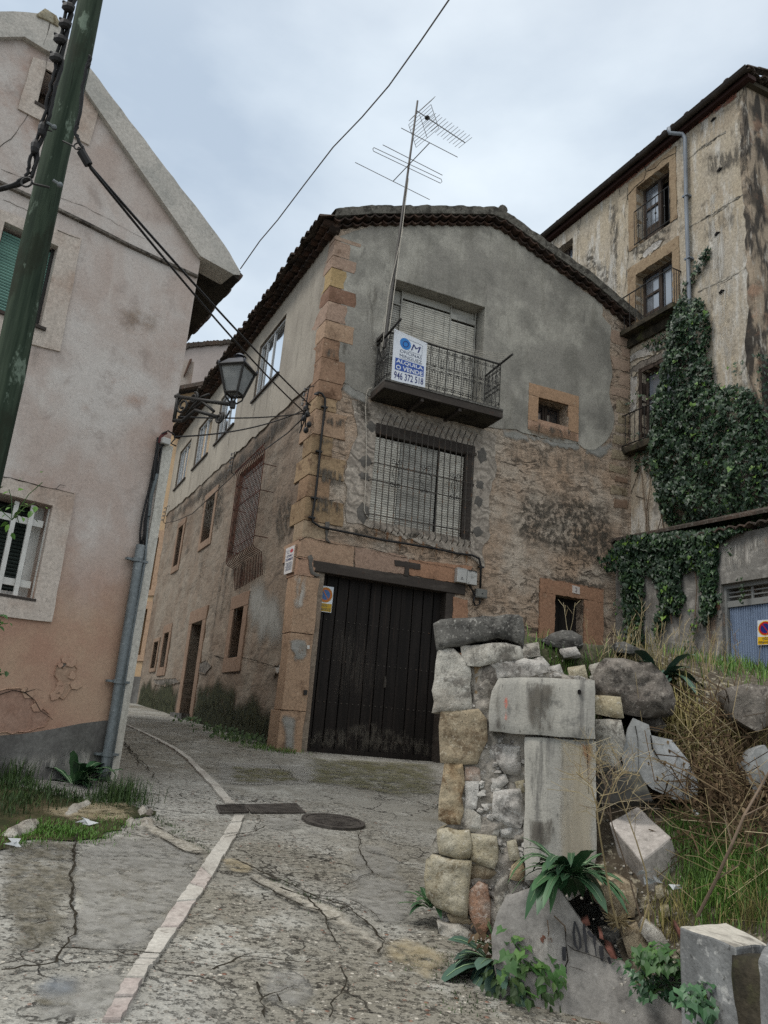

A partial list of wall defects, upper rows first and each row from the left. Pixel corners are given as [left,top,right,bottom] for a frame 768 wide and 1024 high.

crack [0,689,53,720]
crack [1,812,392,1017]